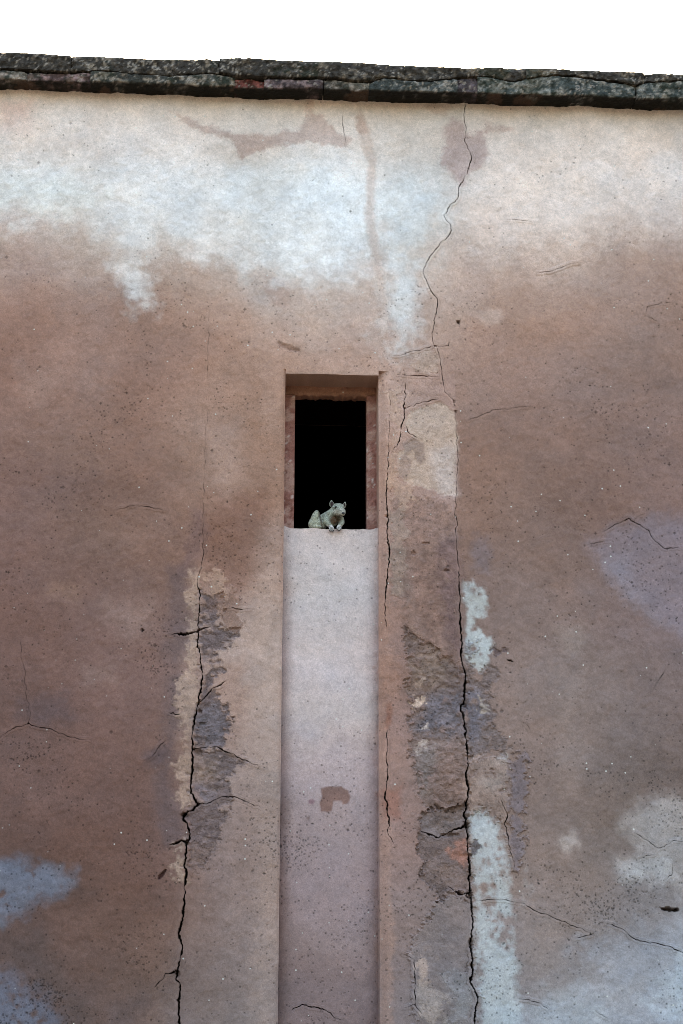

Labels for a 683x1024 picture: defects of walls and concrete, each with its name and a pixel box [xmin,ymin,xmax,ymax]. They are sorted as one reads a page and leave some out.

leakage [0,91,683,373]
leakage [0,960,71,1024]
leakage [0,849,84,933]
crack [0,638,94,744]
spalling [156,566,246,885]
crack [145,409,264,1024]
spalling [371,625,533,1024]
efflorescence [463,578,497,672]
crack [380,103,683,1024]